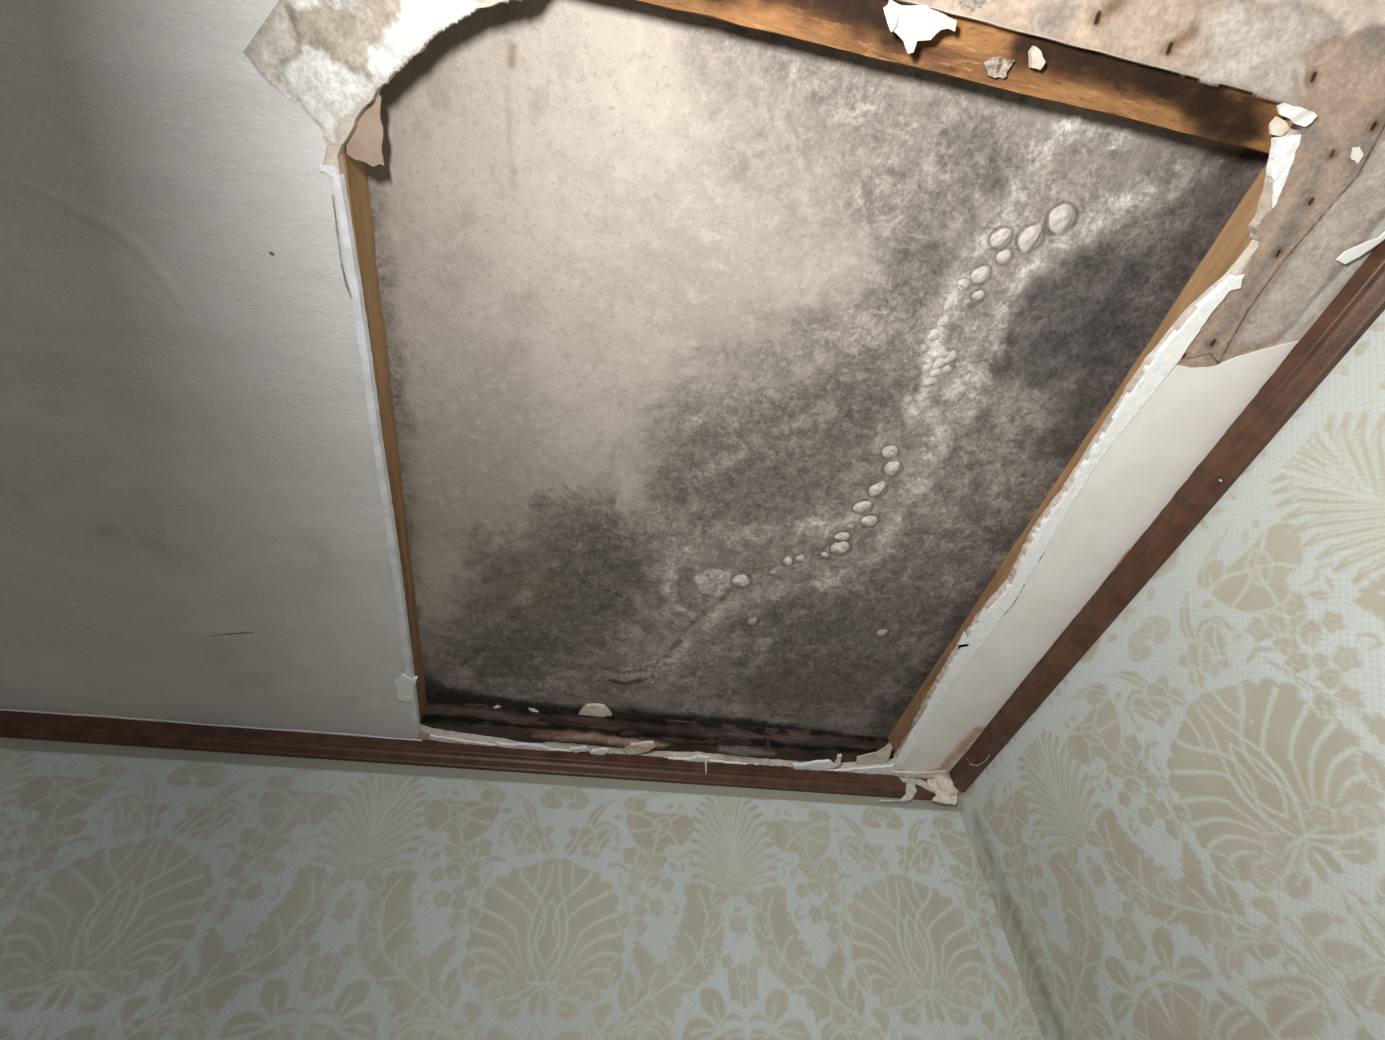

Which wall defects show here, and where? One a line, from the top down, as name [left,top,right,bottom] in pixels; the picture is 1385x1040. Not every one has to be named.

peeling [246,0,477,145]
peeling [883,0,957,54]
peeling [982,46,1046,79]
spalling [1266,103,1317,208]
water stain [370,193,393,320]
peeling [1336,232,1385,264]
water stain [387,345,410,501]
peeling [319,164,1298,776]
water stain [422,0,1385,756]